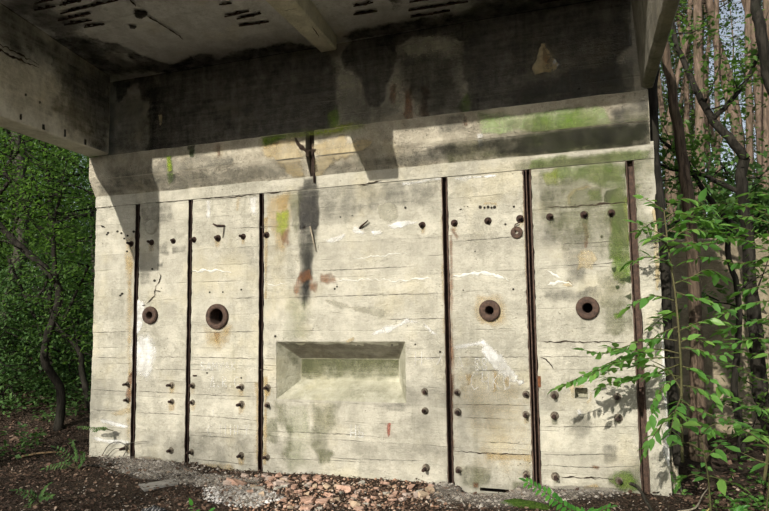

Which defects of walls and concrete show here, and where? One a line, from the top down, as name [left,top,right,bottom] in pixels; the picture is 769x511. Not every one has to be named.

crack [0,44,39,68]
water stain [0,0,336,150]
water stain [342,0,631,118]
spalling [532,44,559,74]
water stain [400,101,649,169]
water stain [291,179,319,306]
water stain [466,340,523,384]